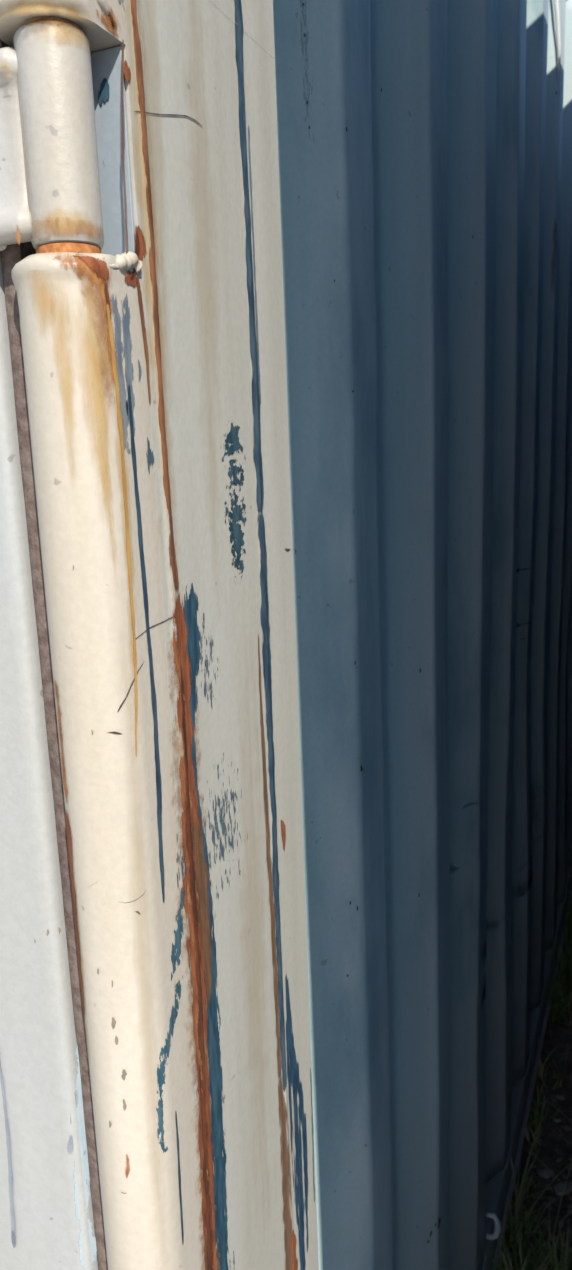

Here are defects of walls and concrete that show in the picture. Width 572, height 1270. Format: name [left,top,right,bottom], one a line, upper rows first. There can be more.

corrosion [19,3,79,37]
corrosion [47,214,95,235]
corrosion [55,253,138,756]
corrosion [97,0,219,1270]
peeling [196,613,221,713]
corrosion [54,683,85,1016]
peeling [156,835,188,1153]
peeling [204,754,248,898]